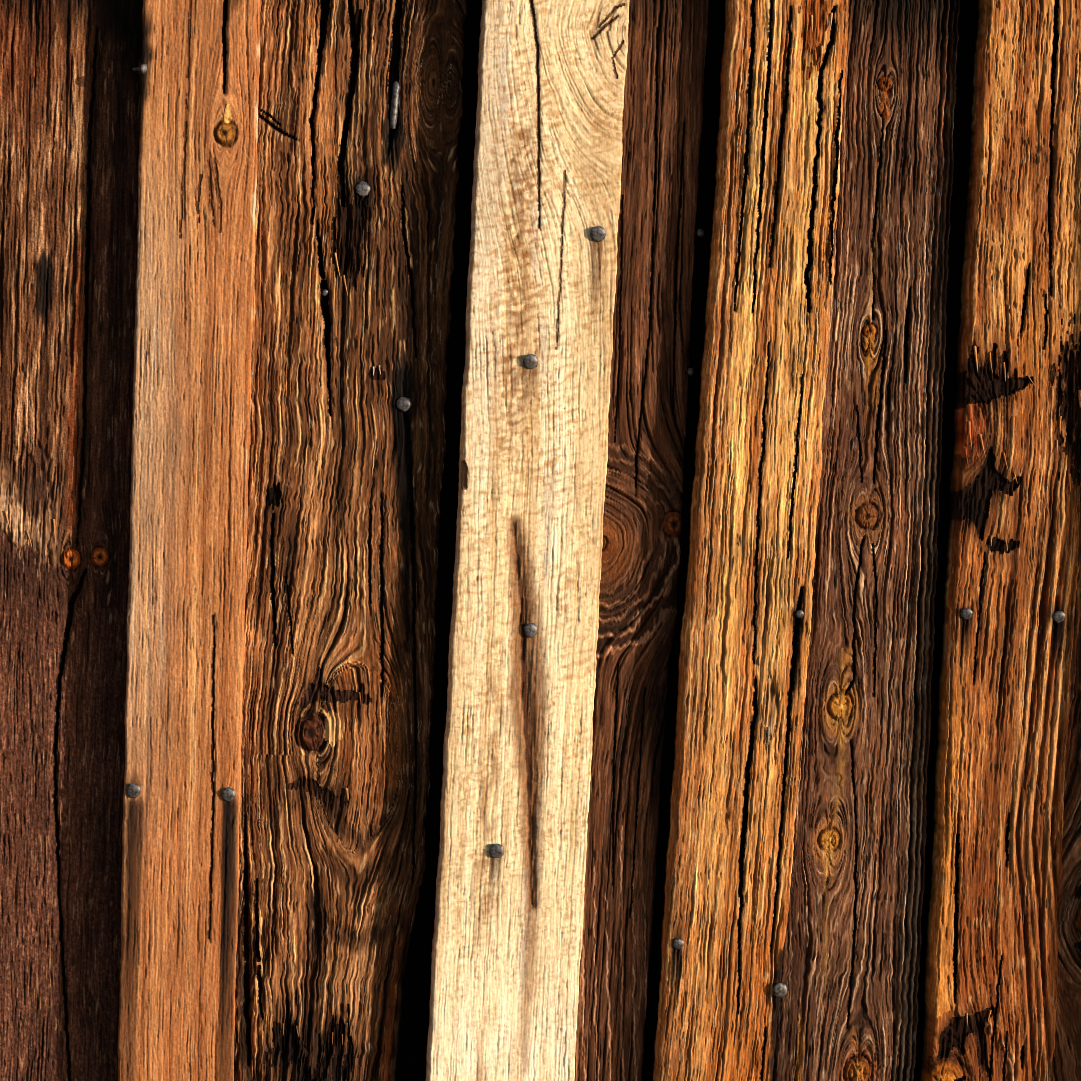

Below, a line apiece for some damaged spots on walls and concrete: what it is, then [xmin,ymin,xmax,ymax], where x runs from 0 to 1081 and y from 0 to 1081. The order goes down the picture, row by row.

crack [258,0,362,416]
crack [388,0,403,105]
crack [401,185,417,358]
crack [530,0,566,350]
crack [734,0,792,313]
crack [804,6,843,313]
crack [52,28,98,1081]
crack [737,342,770,1014]
crack [770,586,803,952]
crack [787,374,804,558]
crack [759,1028,767,1081]